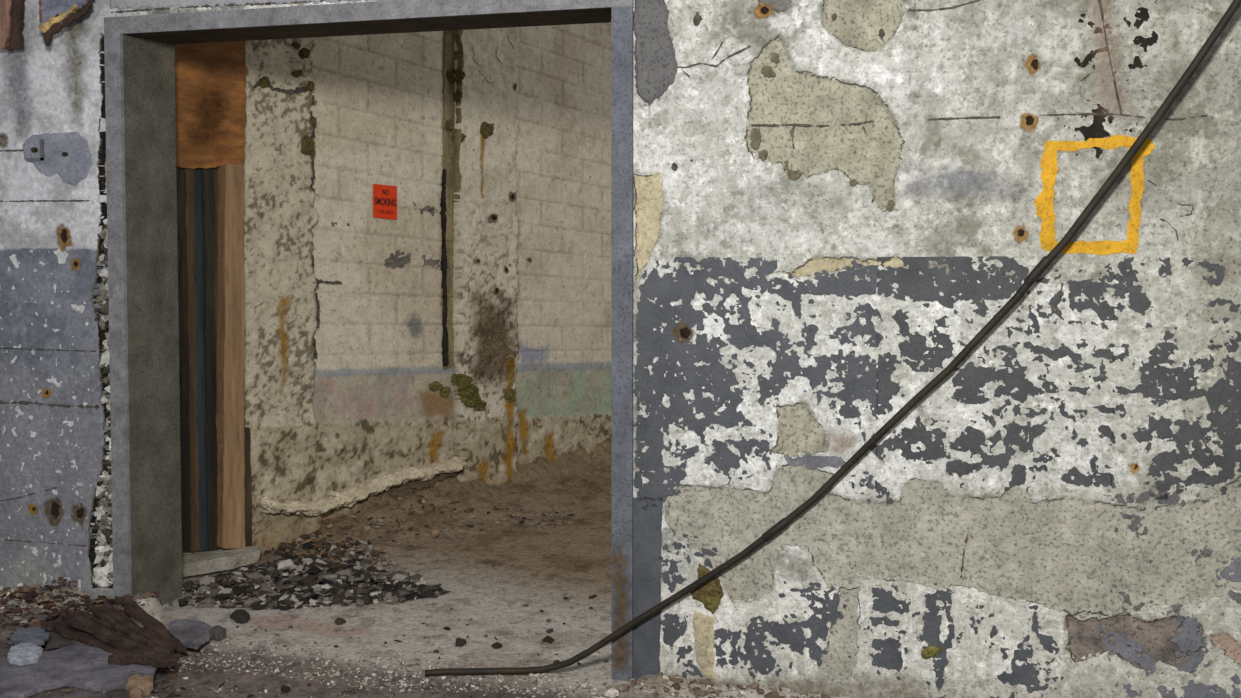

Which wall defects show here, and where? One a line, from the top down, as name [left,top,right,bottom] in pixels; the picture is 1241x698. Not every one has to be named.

leakage [0,50,26,147]
crack [676,42,751,79]
spalling [744,35,905,212]
spalling [821,0,905,52]
rust [1020,113,1038,132]
rust [1024,54,1040,73]
rust [1013,226,1028,243]
spalling [0,33,113,591]
leakage [474,298,549,384]
rust [505,358,529,482]
spalling [633,159,1241,698]
rust [28,498,86,526]